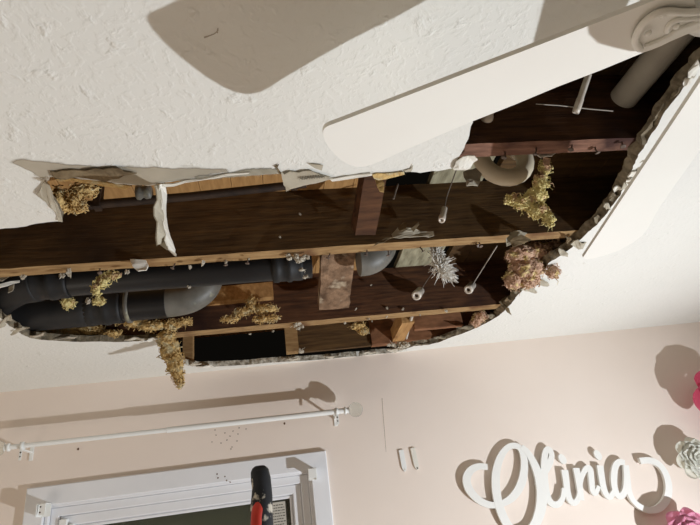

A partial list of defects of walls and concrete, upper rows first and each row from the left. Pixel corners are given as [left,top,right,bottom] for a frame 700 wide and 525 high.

flaking render [640,59,700,145]
peeling [13,159,279,187]
flaking render [603,160,644,210]
flaking render [130,259,148,272]
flaking render [0,314,46,338]